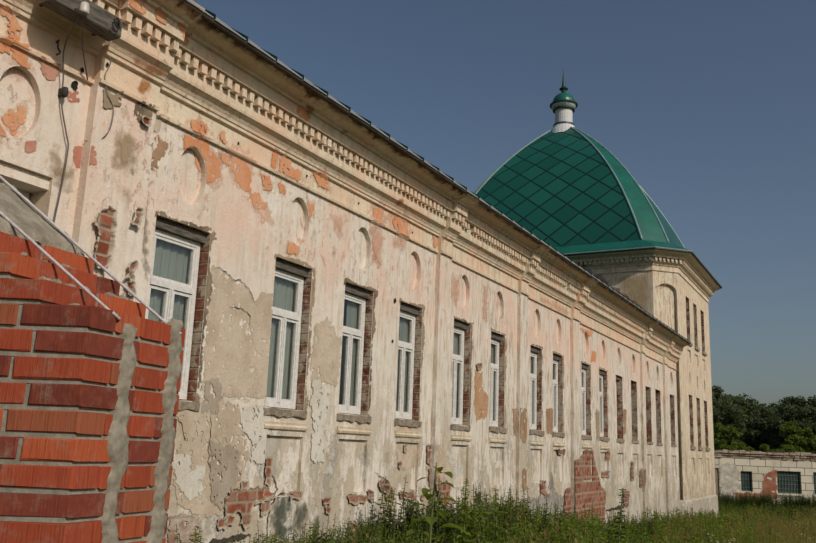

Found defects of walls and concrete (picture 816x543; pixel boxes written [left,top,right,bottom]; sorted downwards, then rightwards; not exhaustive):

flaking render [0,5,60,80]
flaking render [67,67,84,103]
flaking render [184,120,331,224]
flaking render [92,206,117,277]
flaking render [132,207,145,227]
flaking render [119,260,139,300]
flaking render [155,211,277,543]
flaking render [275,242,342,463]
flaking render [564,449,610,526]
flaking render [718,462,778,499]